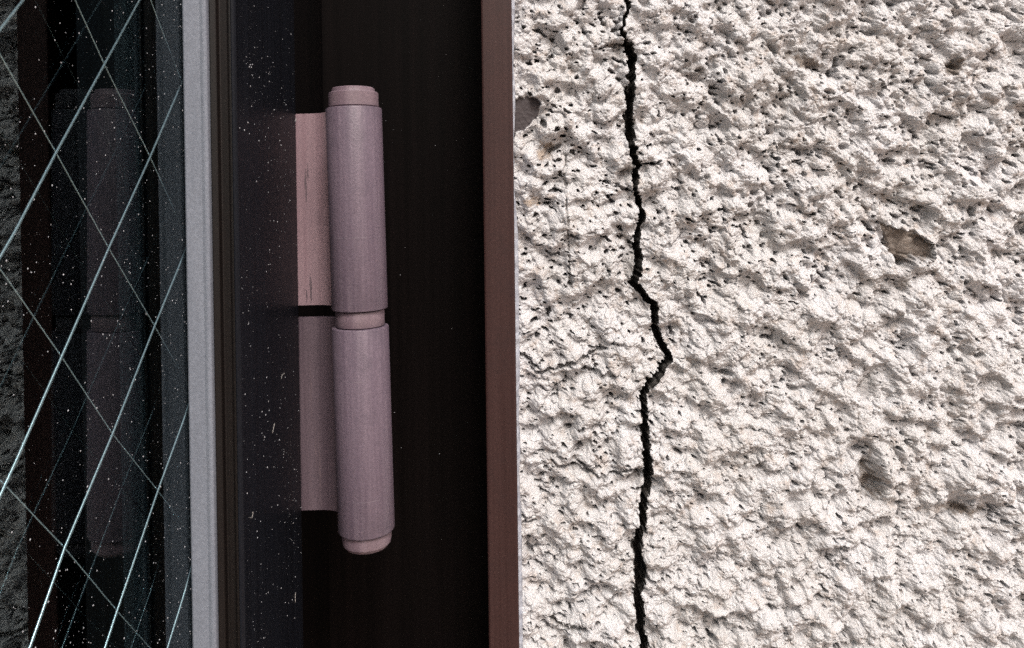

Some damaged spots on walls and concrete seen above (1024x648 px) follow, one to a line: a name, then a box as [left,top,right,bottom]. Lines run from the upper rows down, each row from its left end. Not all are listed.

crack [600,0,674,648]